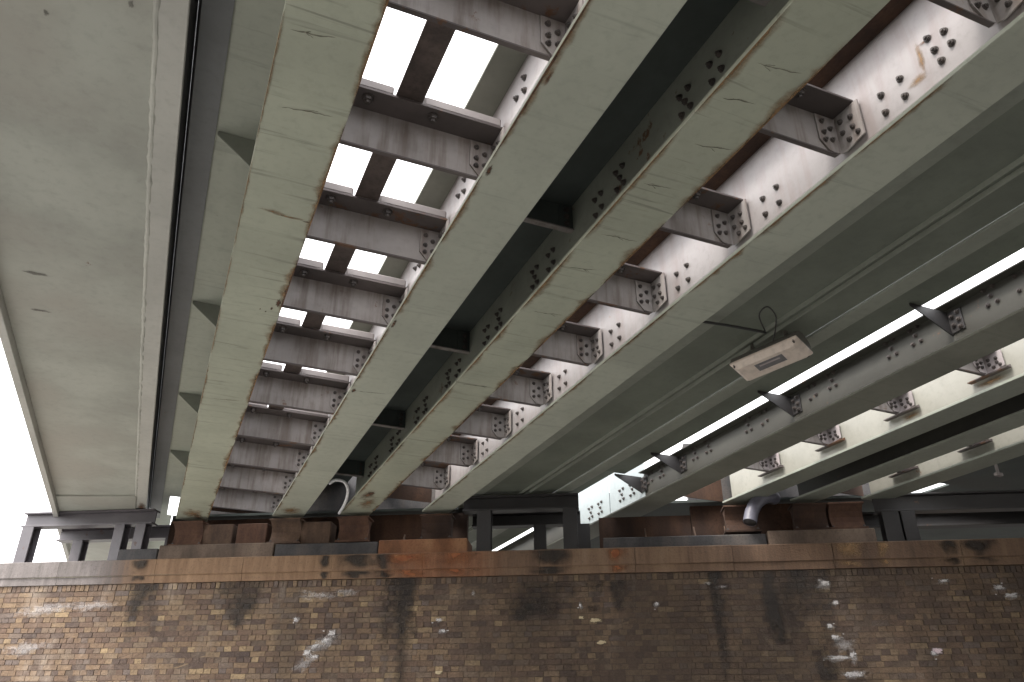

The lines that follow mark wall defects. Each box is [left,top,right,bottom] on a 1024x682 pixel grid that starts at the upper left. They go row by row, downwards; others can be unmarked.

crack [294,30,334,38]
corrosion [354,0,389,100]
corrosion [268,129,344,243]
corrosion [177,256,300,518]
leakage [130,560,157,616]
leakage [320,555,329,579]
leakage [344,554,413,677]
leakage [512,550,569,620]
leakage [763,569,838,641]
leakage [819,652,856,678]